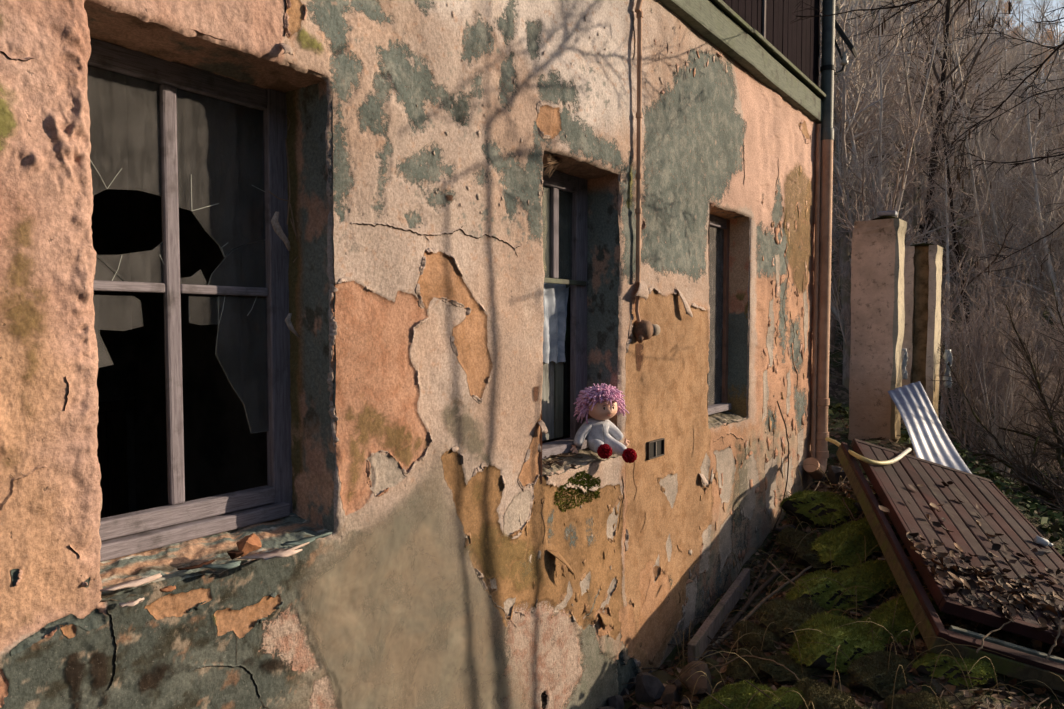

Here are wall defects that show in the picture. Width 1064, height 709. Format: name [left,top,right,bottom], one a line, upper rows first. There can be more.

crack [0,50,35,61]
peeling [799,118,811,145]
crack [351,221,522,256]
peeling [283,0,808,709]
peeling [177,532,332,570]
peeling [11,569,23,587]
peeling [11,608,106,656]
peeling [81,573,341,709]
peeling [0,669,9,708]
crack [189,633,269,709]